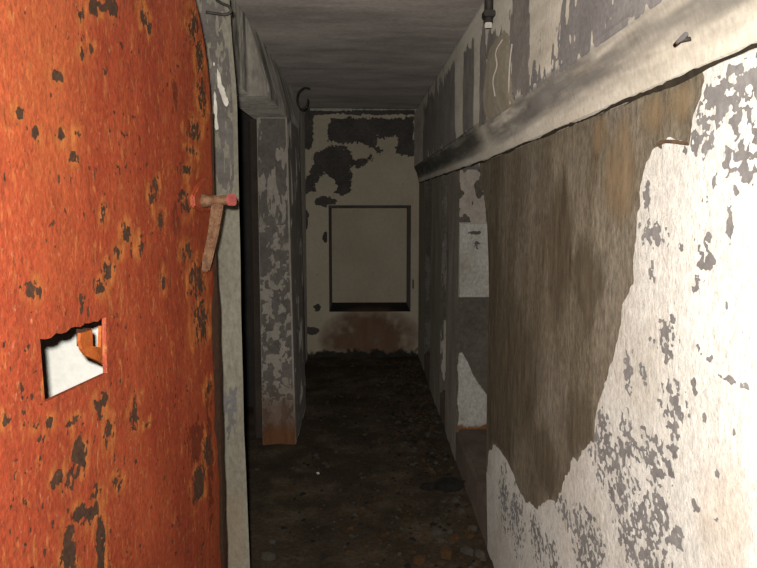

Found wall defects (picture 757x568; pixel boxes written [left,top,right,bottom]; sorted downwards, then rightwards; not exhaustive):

rust [76,0,126,26]
rust [10,106,39,142]
rust [177,8,208,155]
rust [19,280,42,299]
rust [92,189,191,294]
rust [164,242,210,345]
leakage [307,348,418,358]
peeling [258,0,661,441]
spalling [457,52,757,568]
rust [49,375,129,493]
rust [168,381,218,531]
rust [60,483,127,568]